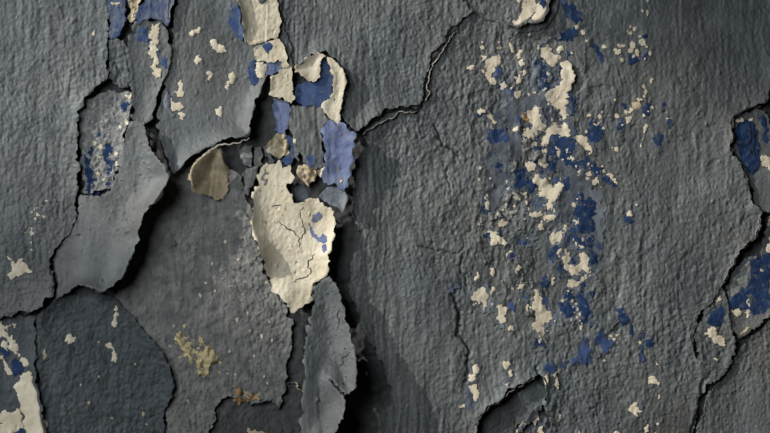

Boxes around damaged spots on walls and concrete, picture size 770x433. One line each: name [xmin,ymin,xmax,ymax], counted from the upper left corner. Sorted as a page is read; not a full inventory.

crack [2,259,75,377]
spalling [77,90,132,196]
peeling [105,0,176,79]
spalling [111,39,357,433]
crack [357,15,469,133]
peeling [459,0,654,433]
peeling [612,78,675,157]
peeling [705,237,770,346]
crack [728,103,770,275]
peeling [735,105,770,177]
peeling [0,322,48,433]
spalling [648,376,660,399]